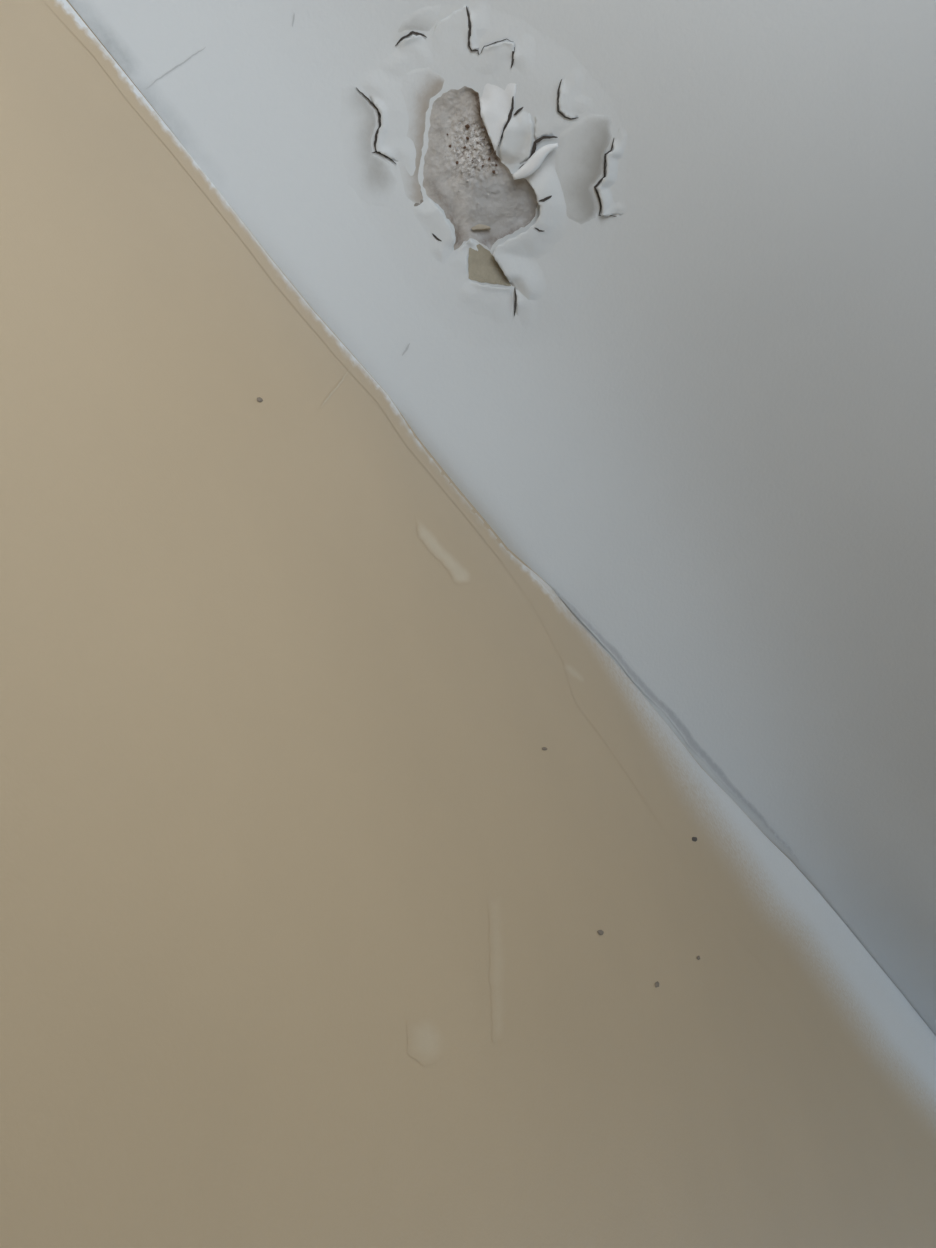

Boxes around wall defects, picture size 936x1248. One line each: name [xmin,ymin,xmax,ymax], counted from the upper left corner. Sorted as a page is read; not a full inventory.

peeling [339,0,628,329]